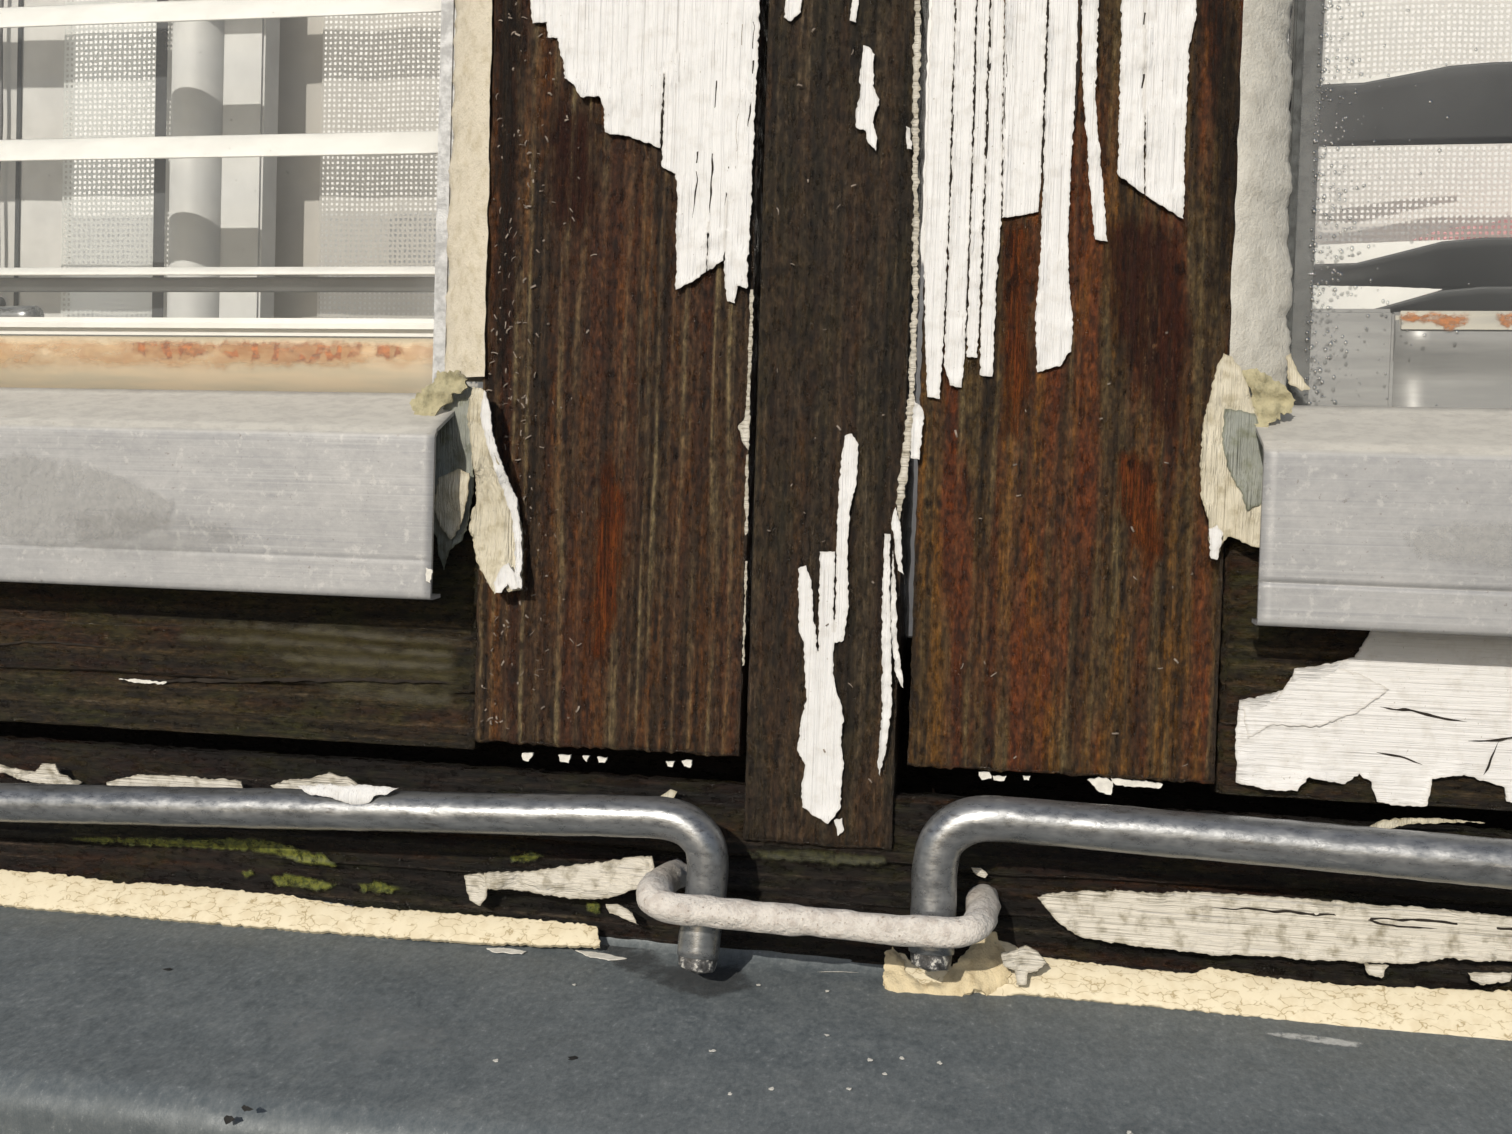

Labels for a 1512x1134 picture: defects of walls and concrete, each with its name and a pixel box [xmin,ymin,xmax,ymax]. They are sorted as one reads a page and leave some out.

peeling [855,45,879,150]
peeling [530,0,760,535]
corrosion [55,341,433,364]
peeling [877,0,1197,775]
corrosion [1401,312,1466,330]
peeling [797,434,859,835]
peeling [106,774,244,788]
peeling [270,772,397,805]
peeling [1235,631,1512,829]
crack [1377,707,1512,774]
peeling [464,856,655,925]
peeling [1037,889,1512,985]